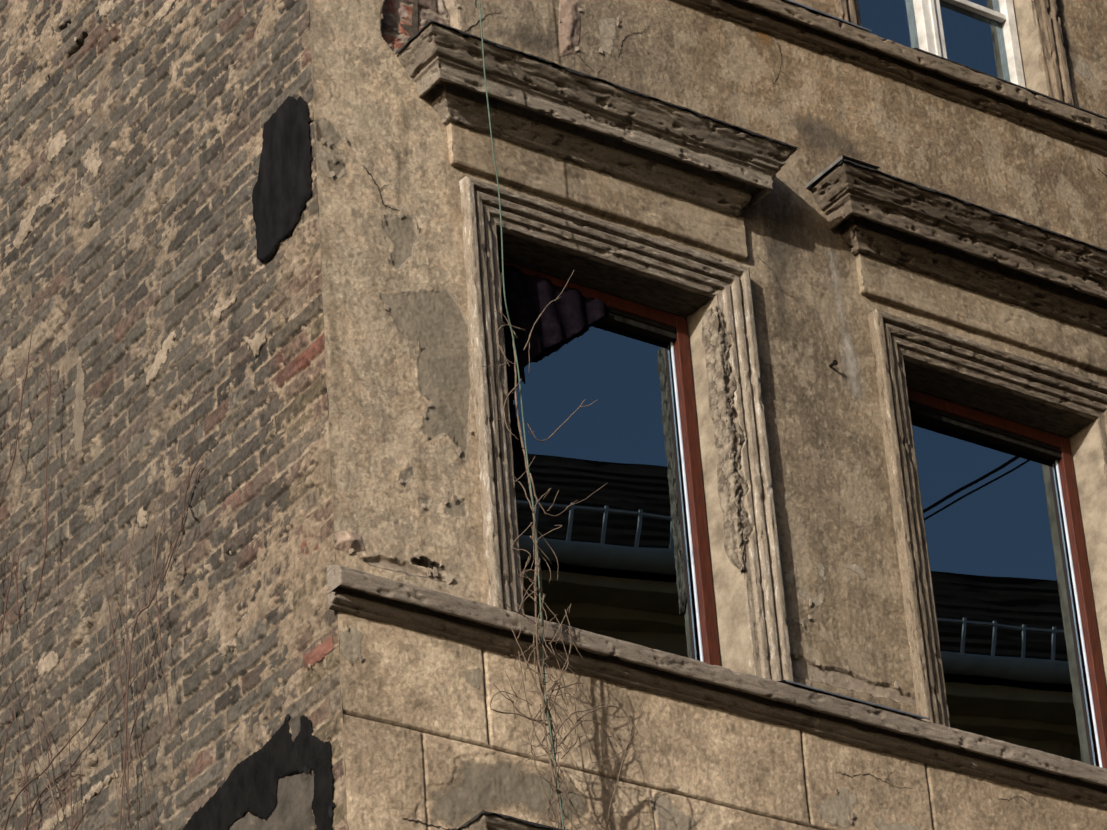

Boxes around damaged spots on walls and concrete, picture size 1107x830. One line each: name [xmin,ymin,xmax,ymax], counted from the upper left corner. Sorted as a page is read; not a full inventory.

spalling [55,23,88,59]
spalling [381,0,460,52]
crack [362,165,399,211]
spalling [361,553,453,584]